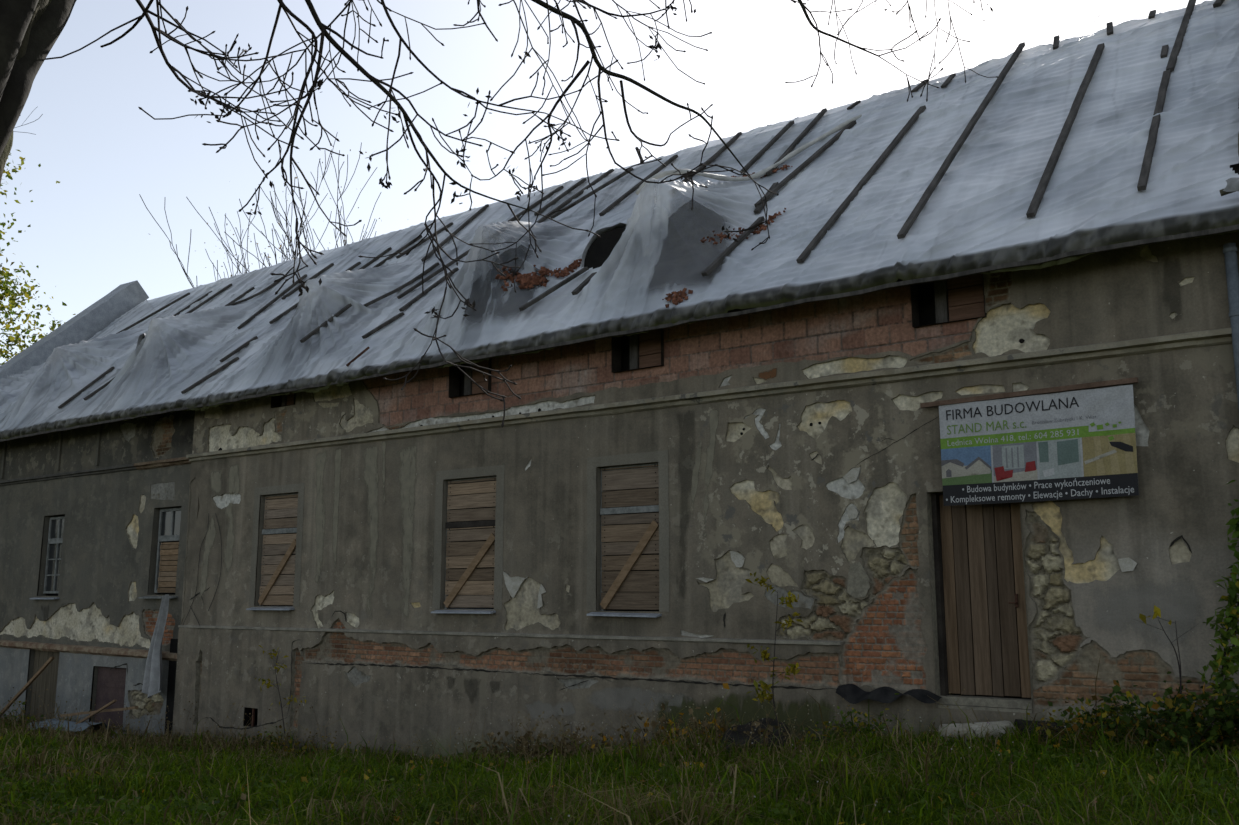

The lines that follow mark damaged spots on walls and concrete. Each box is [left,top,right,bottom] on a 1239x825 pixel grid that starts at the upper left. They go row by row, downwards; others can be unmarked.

peeling [801,271,1050,379]
peeling [200,402,281,452]
peeling [725,408,782,450]
peeling [796,400,852,464]
peeling [125,482,175,550]
peeling [0,581,175,649]
flaking render [290,466,928,730]
flaking render [1023,501,1219,710]